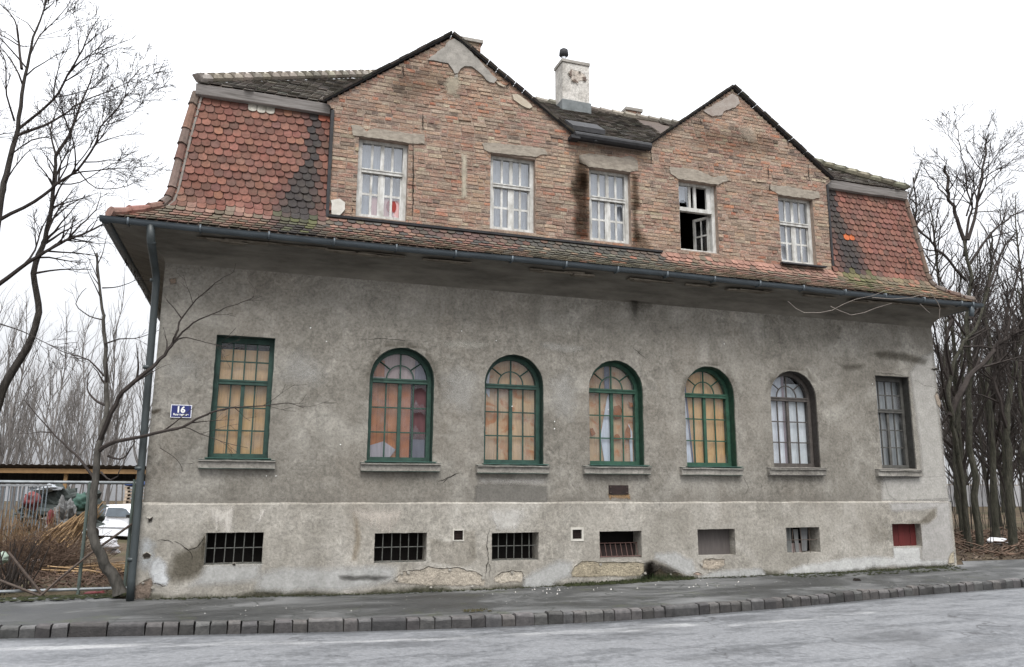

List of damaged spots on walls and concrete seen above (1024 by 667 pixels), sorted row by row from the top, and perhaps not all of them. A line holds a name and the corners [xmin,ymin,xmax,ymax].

peeling [134,558,168,600]
peeling [395,565,525,588]
peeling [572,560,647,579]